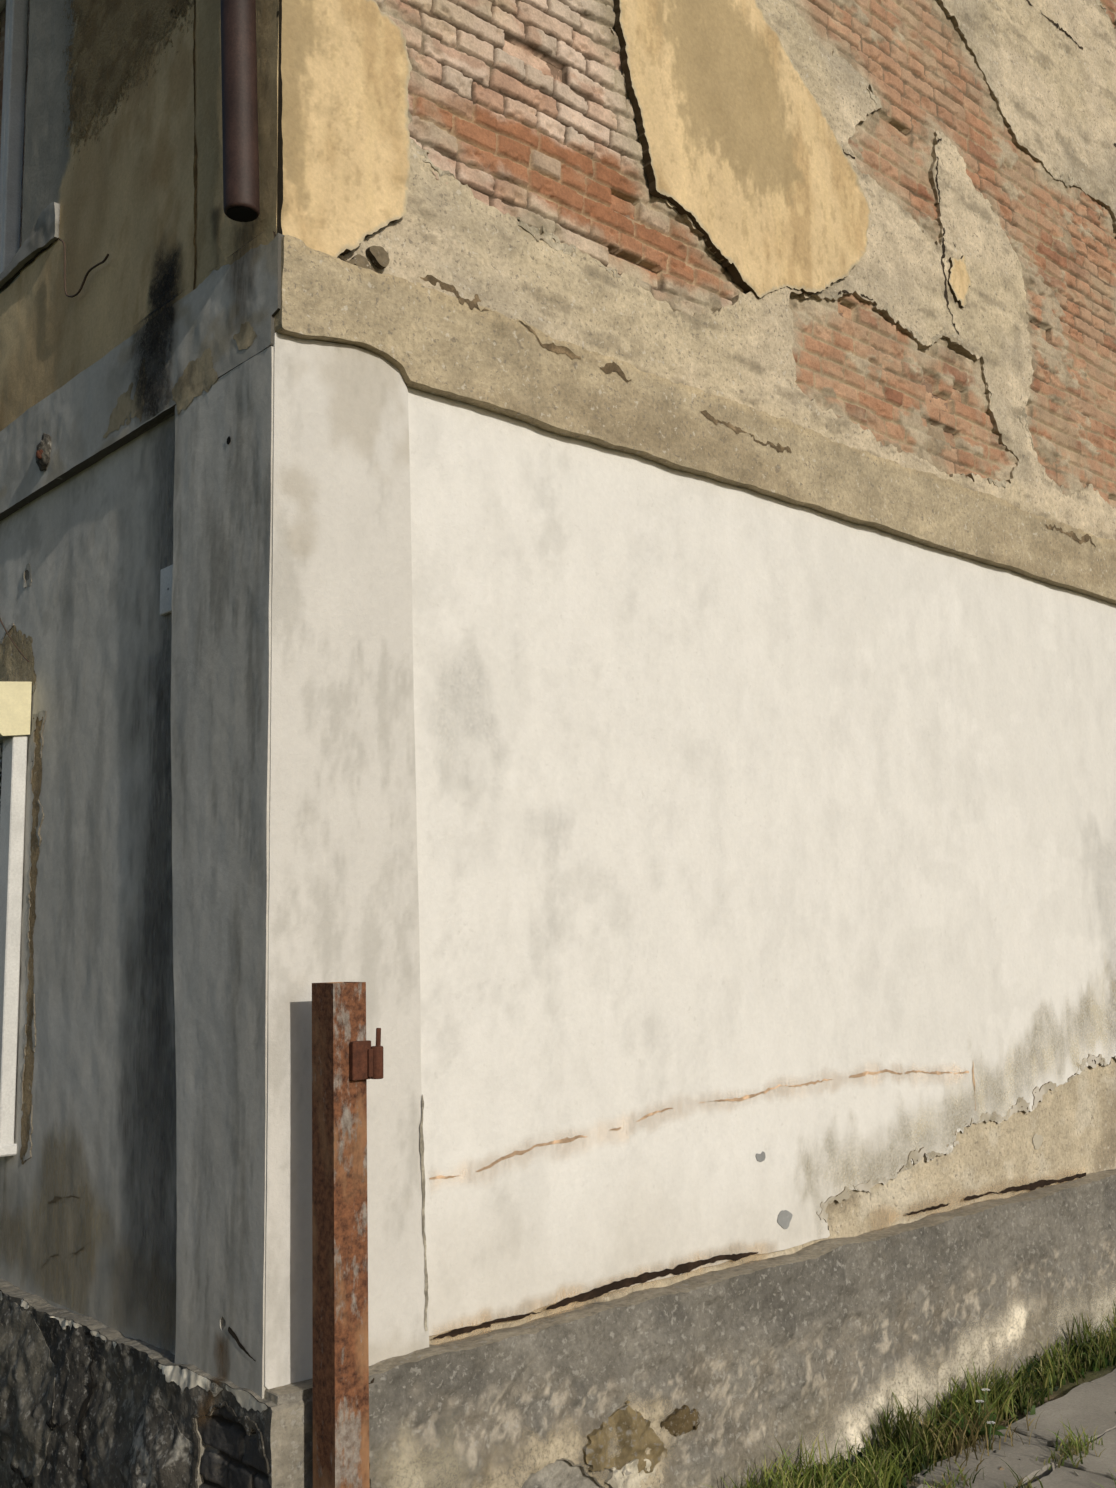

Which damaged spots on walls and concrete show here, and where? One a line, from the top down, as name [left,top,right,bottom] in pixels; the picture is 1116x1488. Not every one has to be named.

crack [1027,0,1083,50]
flaking render [276,0,1116,513]
spalling [1046,524,1096,547]
peeling [0,623,37,692]
peeling [20,710,47,1165]
leakage [122,615,176,1328]
crack [420,1063,976,1331]
peeling [816,1054,1116,1230]
crack [45,1332,97,1488]
spalling [49,1316,116,1348]
flaking render [158,1364,272,1488]
spalling [472,1399,701,1488]